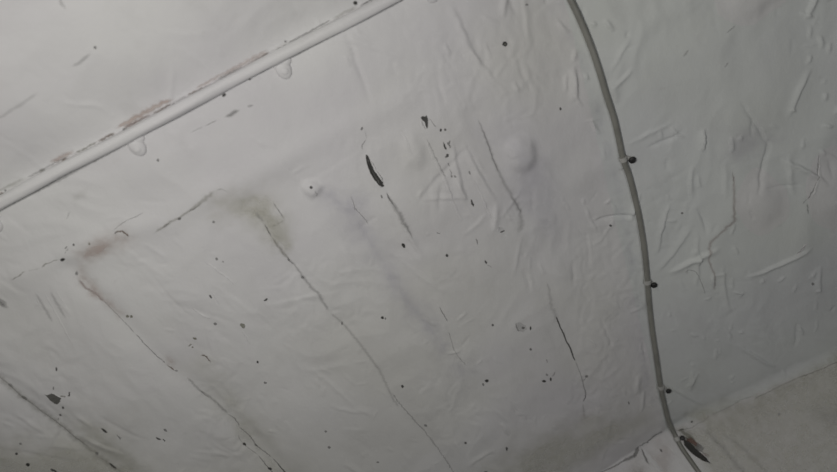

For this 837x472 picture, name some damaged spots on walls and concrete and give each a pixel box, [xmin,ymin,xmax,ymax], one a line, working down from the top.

crack [556,317,575,360]